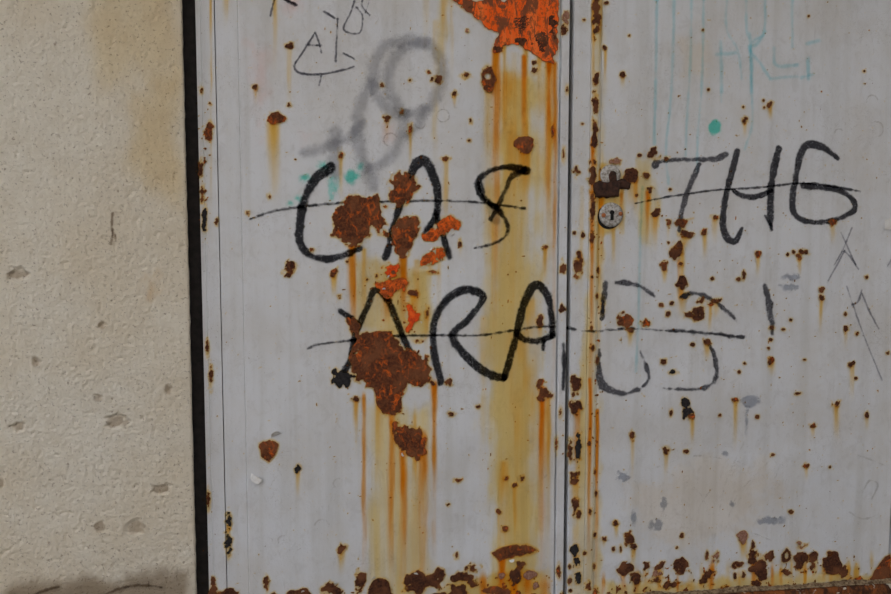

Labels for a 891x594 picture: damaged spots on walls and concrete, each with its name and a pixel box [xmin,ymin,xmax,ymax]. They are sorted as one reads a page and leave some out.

peeling [453,0,559,64]
rust [583,0,609,50]
rust [481,66,496,92]
rust [581,72,603,148]
rust [564,157,655,256]
rust [559,251,599,279]
rust [651,208,722,321]
rust [617,311,651,333]
rust [559,375,603,421]
rust [669,397,695,420]
rust [555,428,598,485]
rust [287,525,891,594]